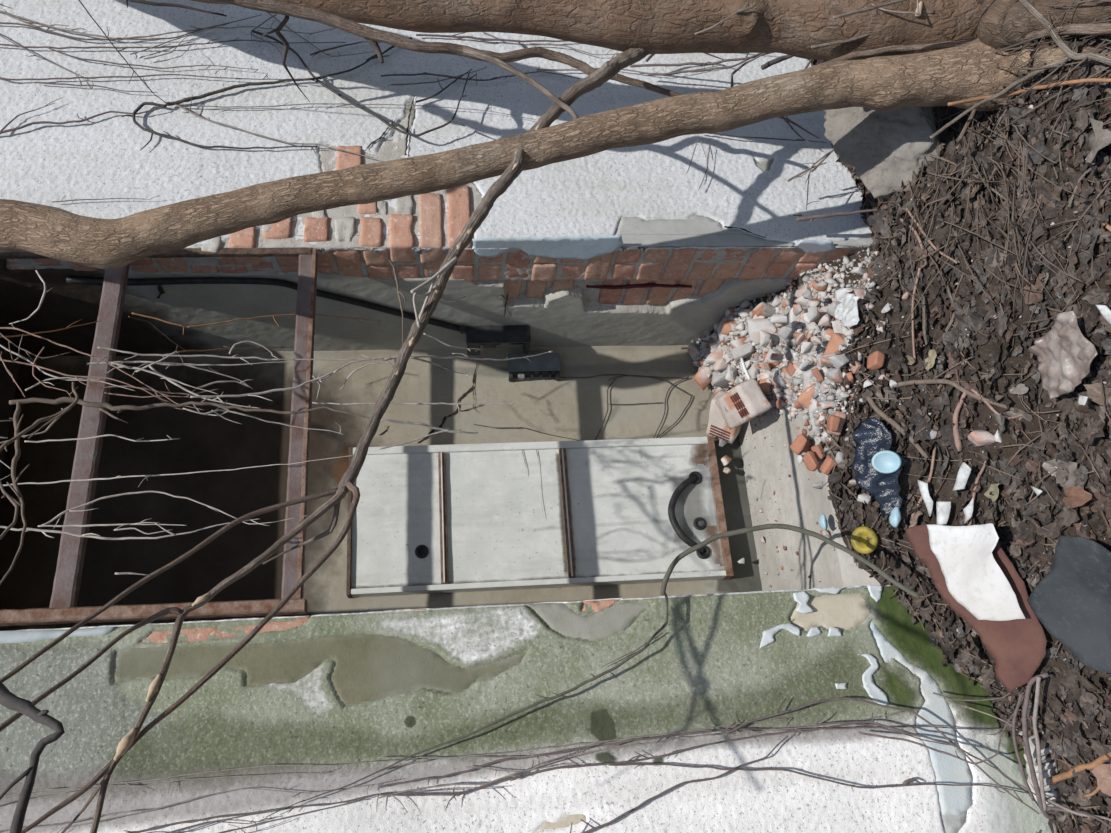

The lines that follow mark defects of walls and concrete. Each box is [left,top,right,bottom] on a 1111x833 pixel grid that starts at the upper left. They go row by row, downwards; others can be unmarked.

flaking render [318,99,415,172]
flaking render [6,259,102,271]
flaking render [129,182,873,305]
damp [0,259,105,610]
damp [77,304,293,607]
damp [304,382,359,572]
crack [417,364,483,443]
damp [559,362,699,373]
peeling [113,615,526,705]
damp [0,436,1052,833]
peeling [525,599,650,641]
peeling [760,585,973,833]